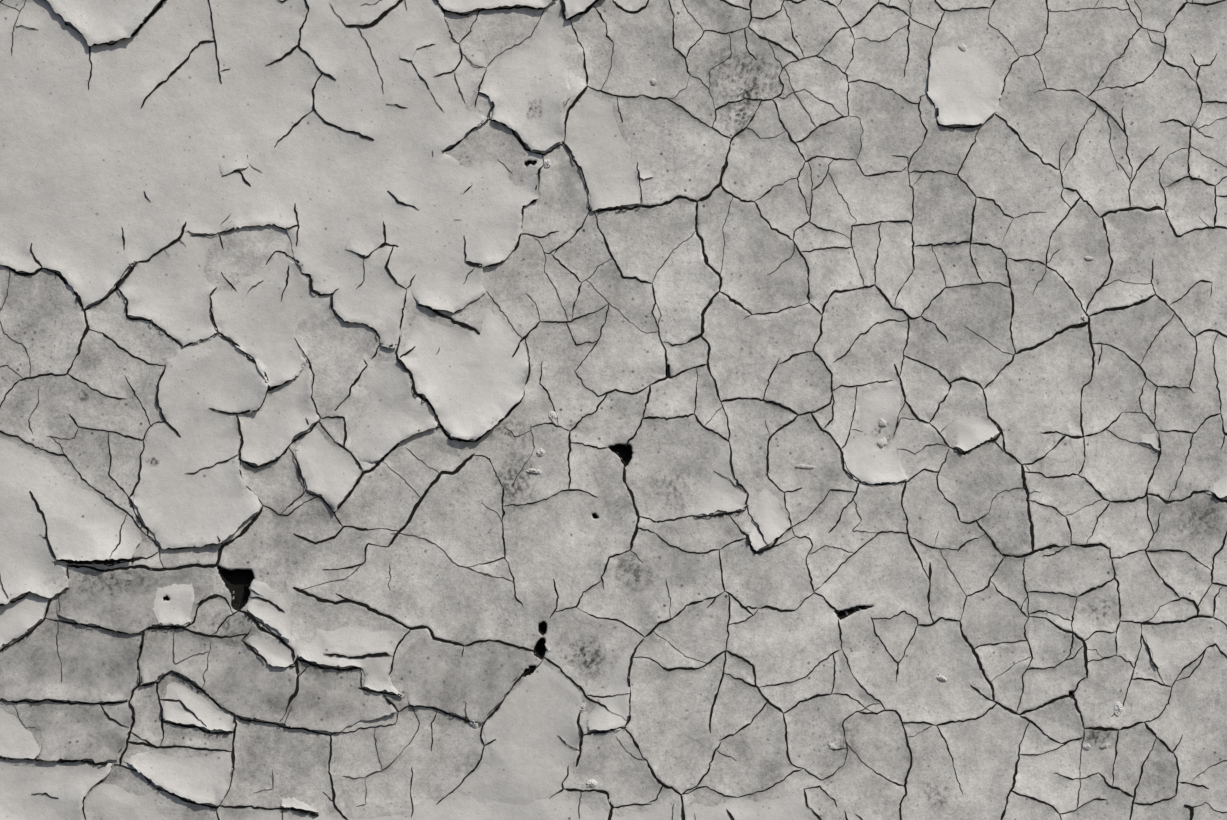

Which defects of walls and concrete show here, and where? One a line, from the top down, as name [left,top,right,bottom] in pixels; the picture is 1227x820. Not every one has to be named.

crack [0,0,166,88]
crack [141,0,230,108]
crack [265,0,407,146]
peeling [925,46,1003,125]
crack [222,155,261,187]
crack [191,204,300,248]
crack [0,221,534,675]
peeling [0,0,820,820]
crack [433,0,1227,820]
peeling [1210,476,1227,498]
crack [0,588,470,820]
peeling [1145,633,1166,669]